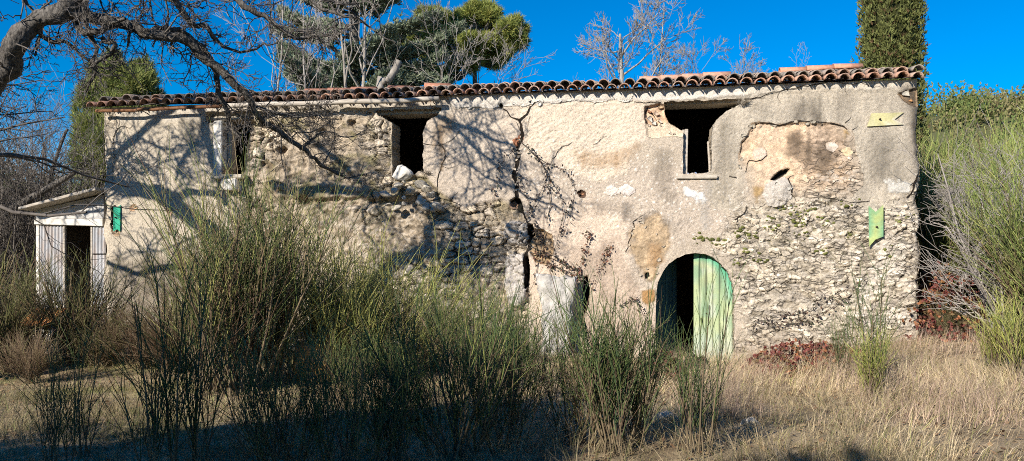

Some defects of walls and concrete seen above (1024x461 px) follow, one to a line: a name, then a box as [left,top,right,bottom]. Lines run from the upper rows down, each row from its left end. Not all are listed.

crack [497,102,538,292]
spalling [644,103,683,138]
spalling [738,119,863,200]
spalling [630,214,670,282]